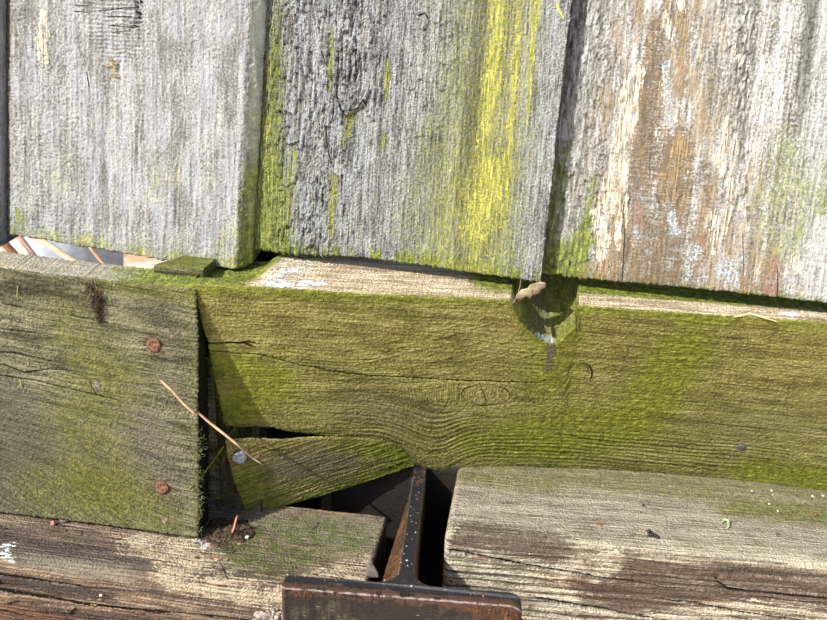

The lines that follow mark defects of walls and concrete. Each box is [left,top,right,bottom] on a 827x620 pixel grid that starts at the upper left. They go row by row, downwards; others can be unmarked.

crack [208,340,540,406]
crack [264,427,360,451]
crack [453,549,591,575]
rust [466,600,520,620]
crack [535,577,827,620]